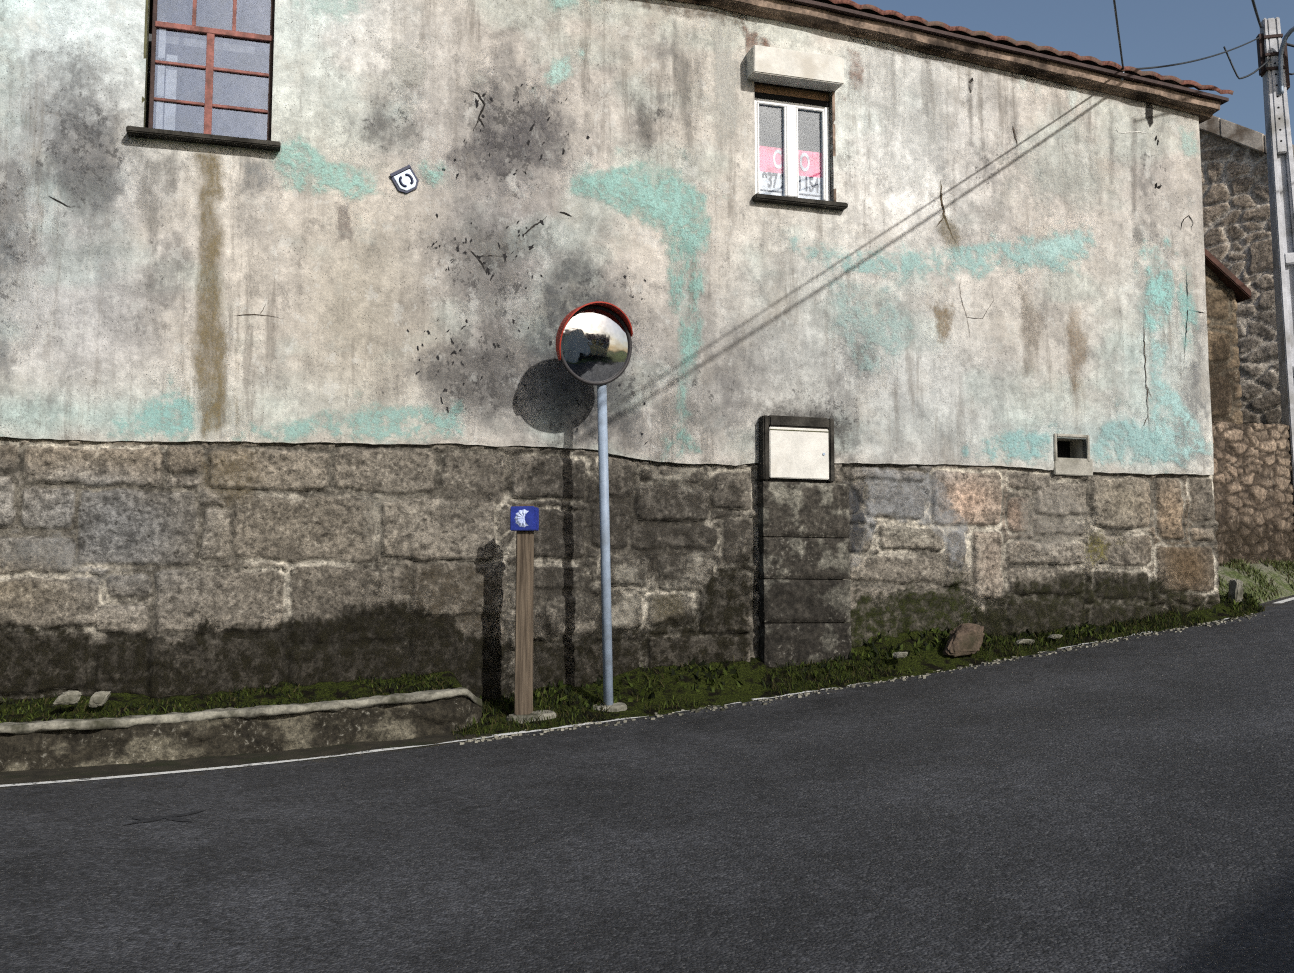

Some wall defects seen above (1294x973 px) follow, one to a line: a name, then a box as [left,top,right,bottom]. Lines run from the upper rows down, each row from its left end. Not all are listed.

water stain [442,75,569,178]
water stain [428,220,544,287]
water stain [407,269,648,445]